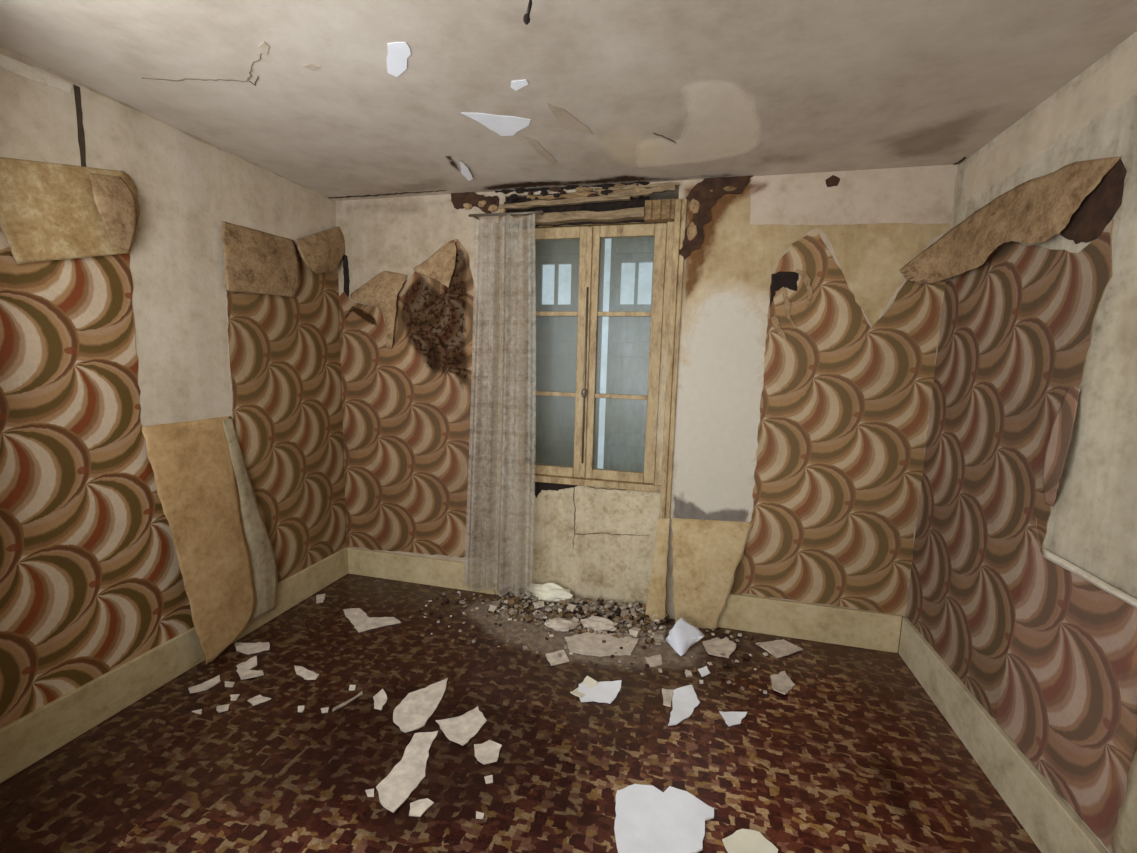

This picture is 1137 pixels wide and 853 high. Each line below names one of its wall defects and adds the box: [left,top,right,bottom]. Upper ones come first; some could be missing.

peeling [387,42,411,77]
damp [686,185,760,294]
peeling [0,53,504,680]
peeling [644,164,959,727]
peeling [188,675,220,693]
peeling [247,695,271,706]
peeling [332,689,387,712]